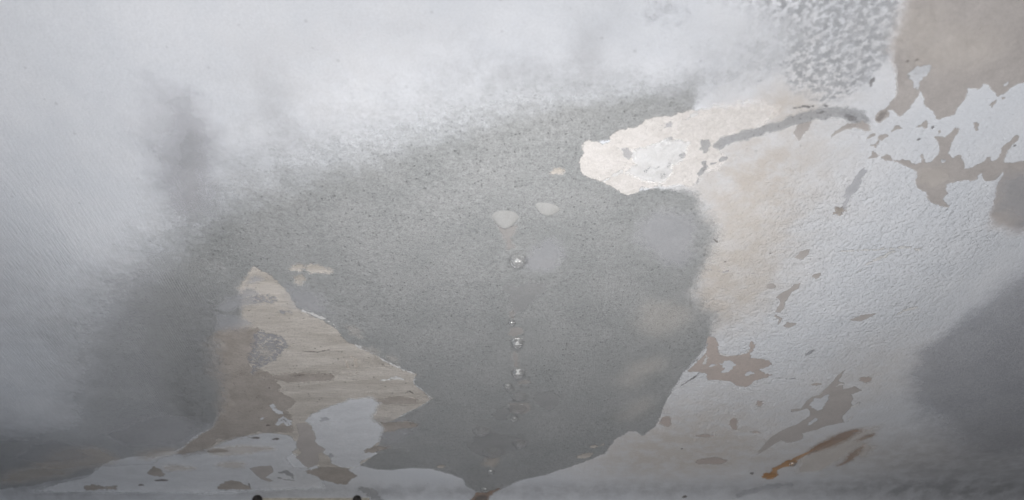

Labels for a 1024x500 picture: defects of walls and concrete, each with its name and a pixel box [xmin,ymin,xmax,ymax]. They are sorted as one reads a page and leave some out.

peeling [875,0,1024,123]
spalling [141,83,1024,493]
rust [762,430,874,479]